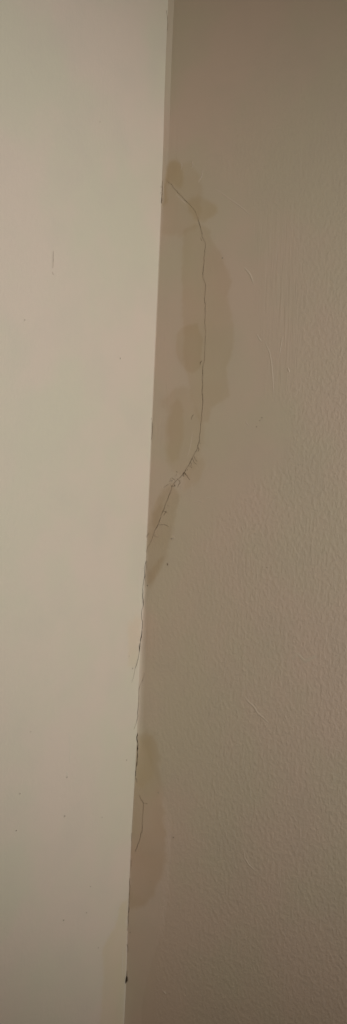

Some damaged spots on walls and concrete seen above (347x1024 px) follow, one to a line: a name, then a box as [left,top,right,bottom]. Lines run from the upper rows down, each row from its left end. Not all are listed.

damp [145,154,236,593]
damp [97,726,171,1024]